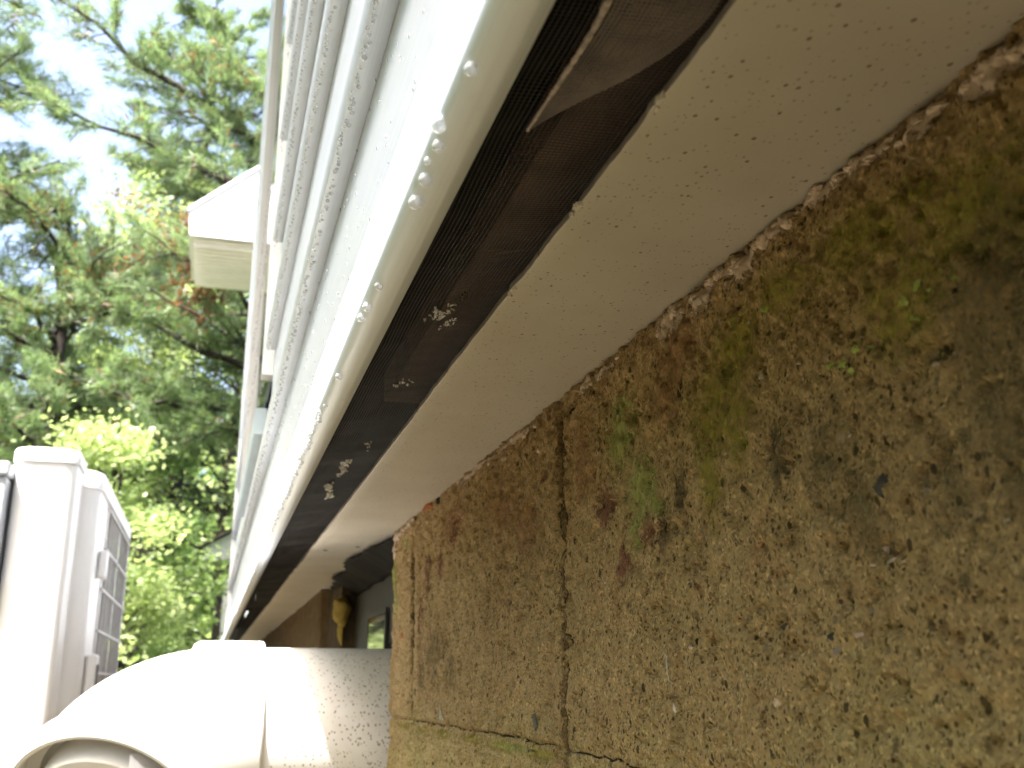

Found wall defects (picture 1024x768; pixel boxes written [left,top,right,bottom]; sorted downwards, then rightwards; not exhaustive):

water stain [766,417,790,496]
water stain [627,461,688,574]
crack [401,417,639,768]